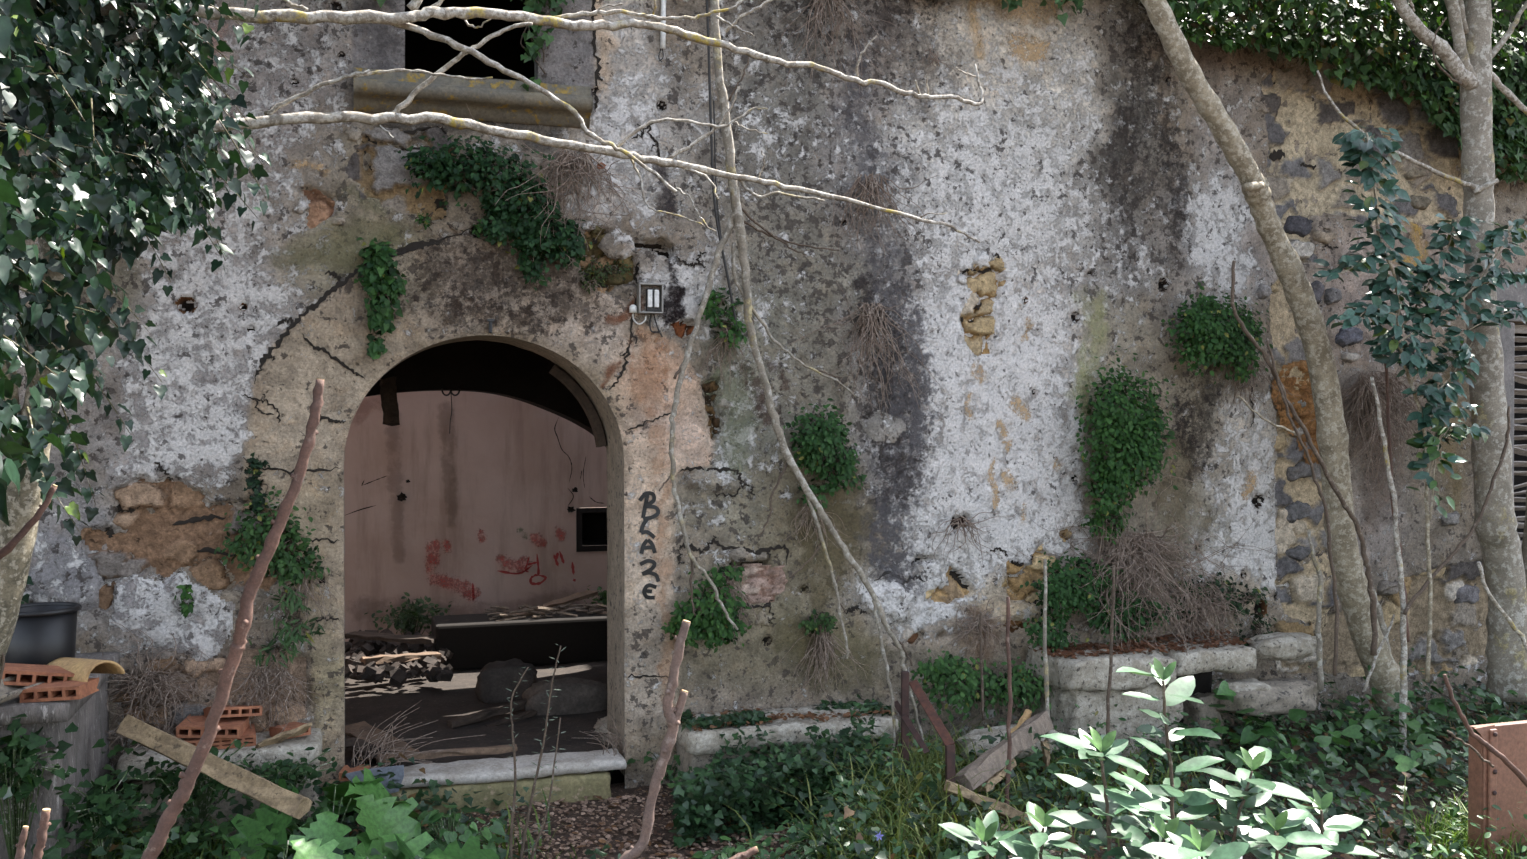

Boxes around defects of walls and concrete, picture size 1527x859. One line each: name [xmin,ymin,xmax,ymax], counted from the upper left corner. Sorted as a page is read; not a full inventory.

spalling [293,159,346,229]
spalling [345,126,483,238]
crack [243,228,470,424]
spalling [956,250,1006,420]
crack [678,466,755,497]
spalling [80,477,286,610]
crack [677,535,789,565]
crack [743,600,776,624]
spalling [924,566,969,604]
spalling [1254,593,1278,617]